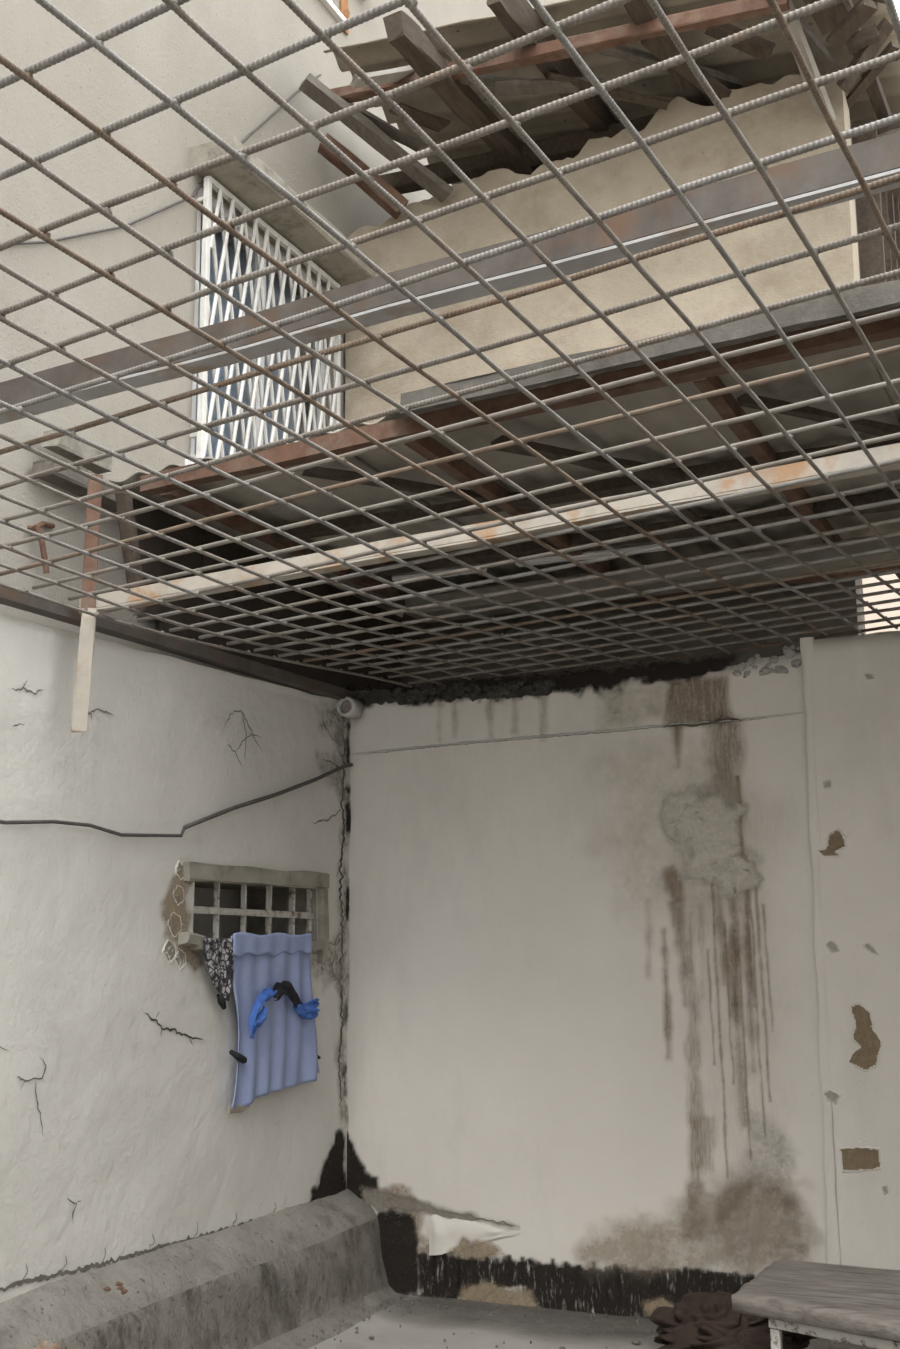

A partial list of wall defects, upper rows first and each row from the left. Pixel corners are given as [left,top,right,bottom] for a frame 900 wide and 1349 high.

crack [225,710,264,766]
spalling [816,828,854,866]
spalling [841,990,895,1081]
leakage [310,1130,378,1202]
spalling [830,1136,882,1184]
leakage [581,1186,802,1271]